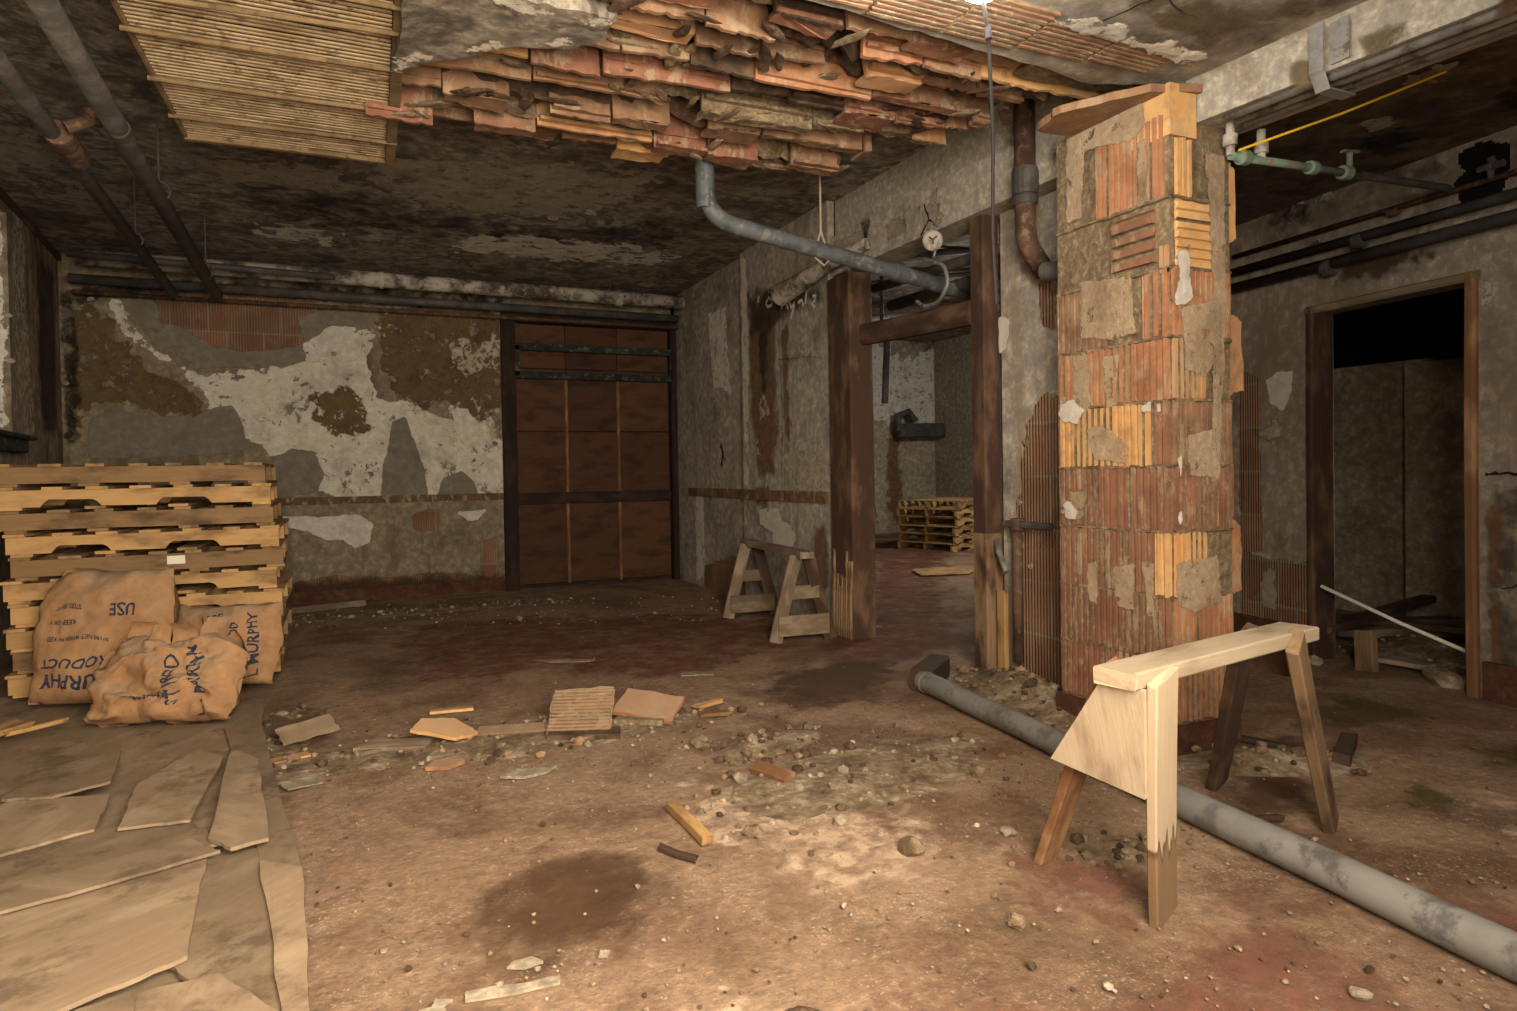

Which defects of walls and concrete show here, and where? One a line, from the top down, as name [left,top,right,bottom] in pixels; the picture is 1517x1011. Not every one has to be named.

peeling [1055,17,1208,65]
water stain [0,125,155,219]
water stain [169,148,510,237]
flaking render [1038,280,1056,330]
peeling [61,289,503,548]
crack [1485,469,1517,477]
flaking render [1016,392,1079,691]